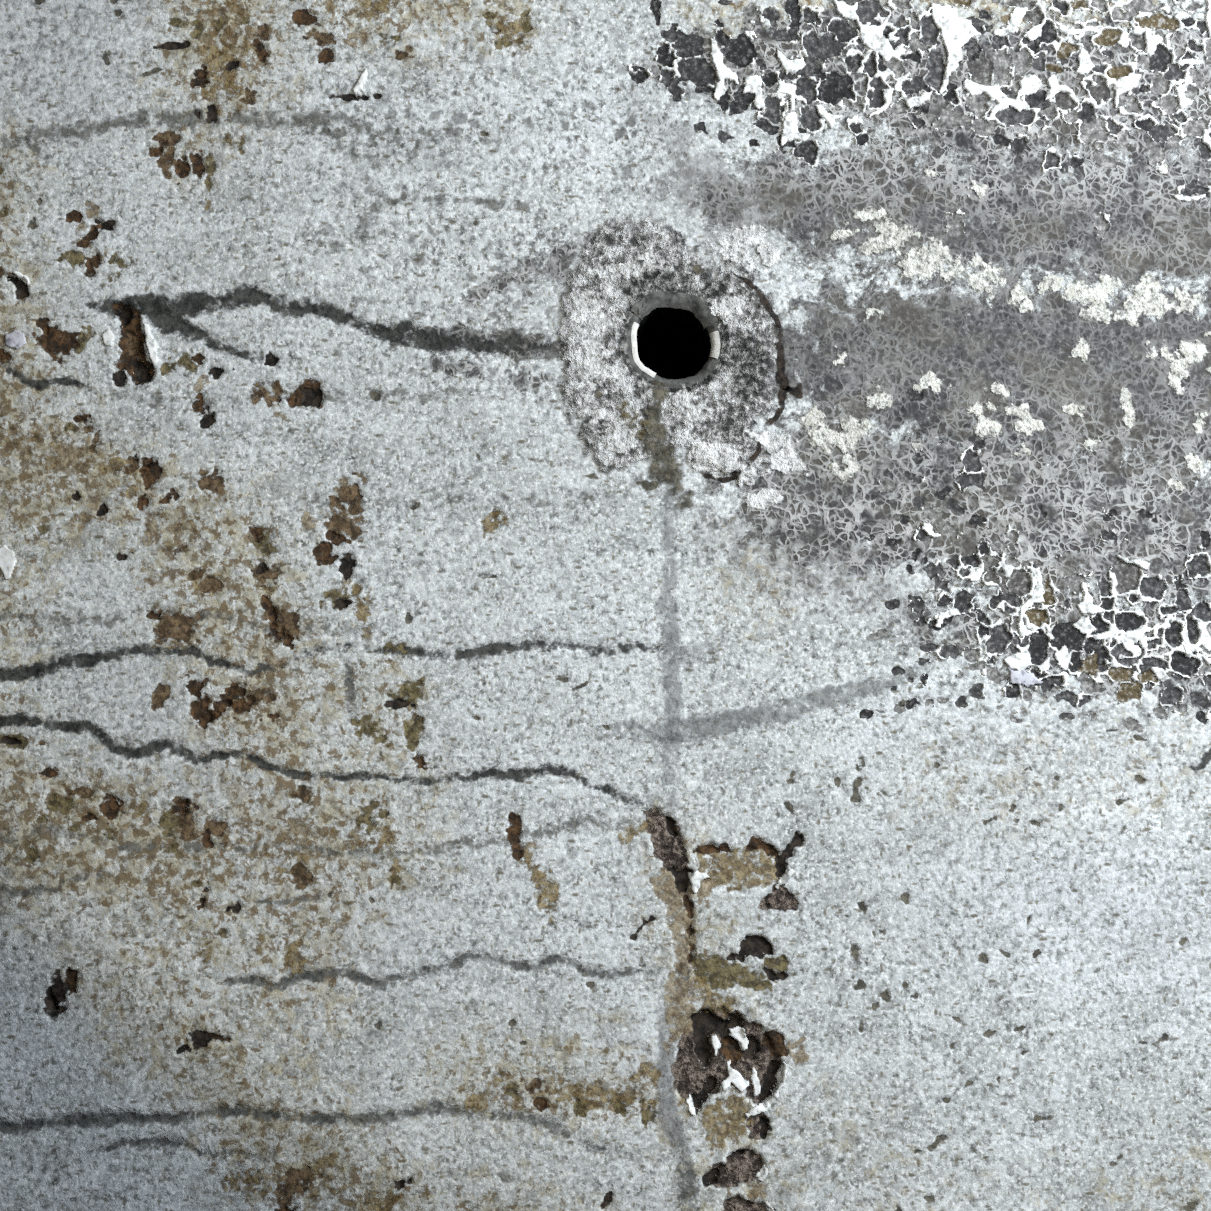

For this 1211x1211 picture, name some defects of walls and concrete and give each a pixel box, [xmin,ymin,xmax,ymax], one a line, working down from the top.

peeling [629,0,1211,173]
corrosion [57,201,133,282]
corrosion [250,352,323,420]
crack [87,283,551,361]
crack [702,272,803,483]
water stain [617,0,1211,782]
corrosion [301,472,373,638]
peeling [860,433,1211,724]
corrosion [186,672,280,729]
crack [0,609,664,898]
peeling [1106,717,1147,741]
crack [223,953,653,991]